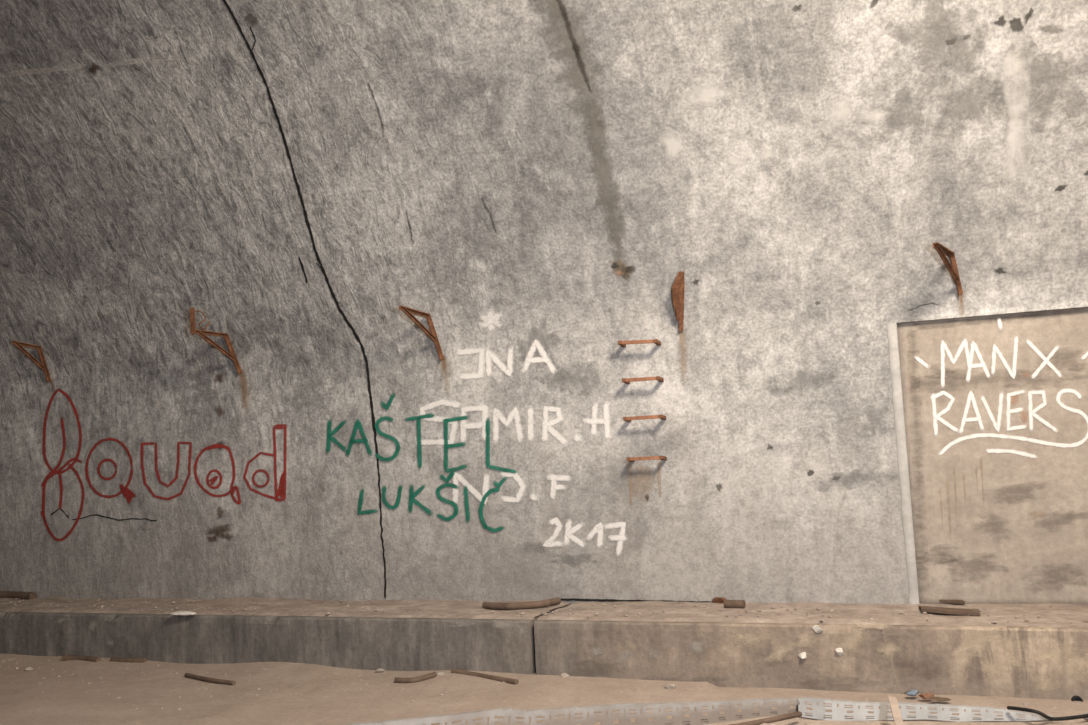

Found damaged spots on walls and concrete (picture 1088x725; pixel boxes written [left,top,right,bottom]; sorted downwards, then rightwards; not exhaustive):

leakage [535,0,622,257]
crack [223,0,387,598]
corrosion [208,507,231,541]